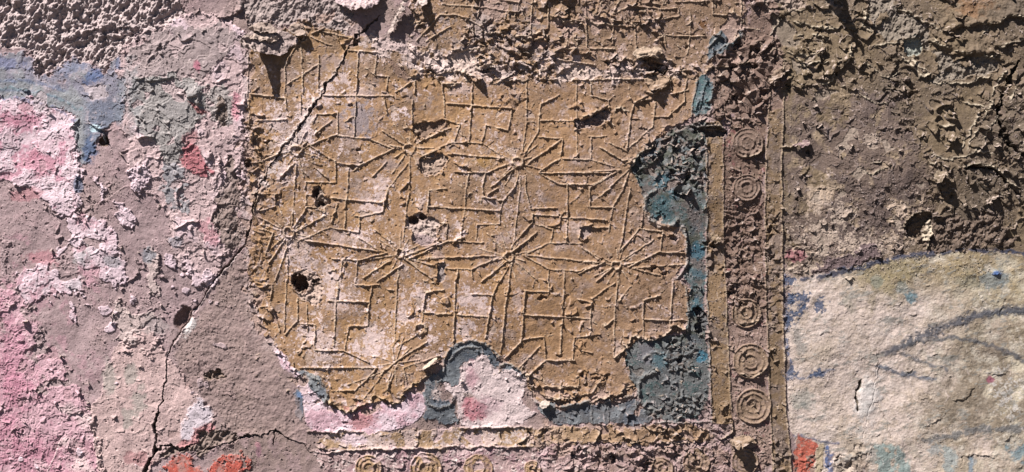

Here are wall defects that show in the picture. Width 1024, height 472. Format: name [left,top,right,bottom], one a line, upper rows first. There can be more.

spalling [371,0,429,83]
peeling [432,0,662,90]
peeling [556,0,1024,281]
peeling [0,0,380,472]
crack [142,15,379,472]
peeling [710,221,767,328]
peeling [614,306,709,373]
peeling [274,348,636,446]
peeling [576,394,757,468]